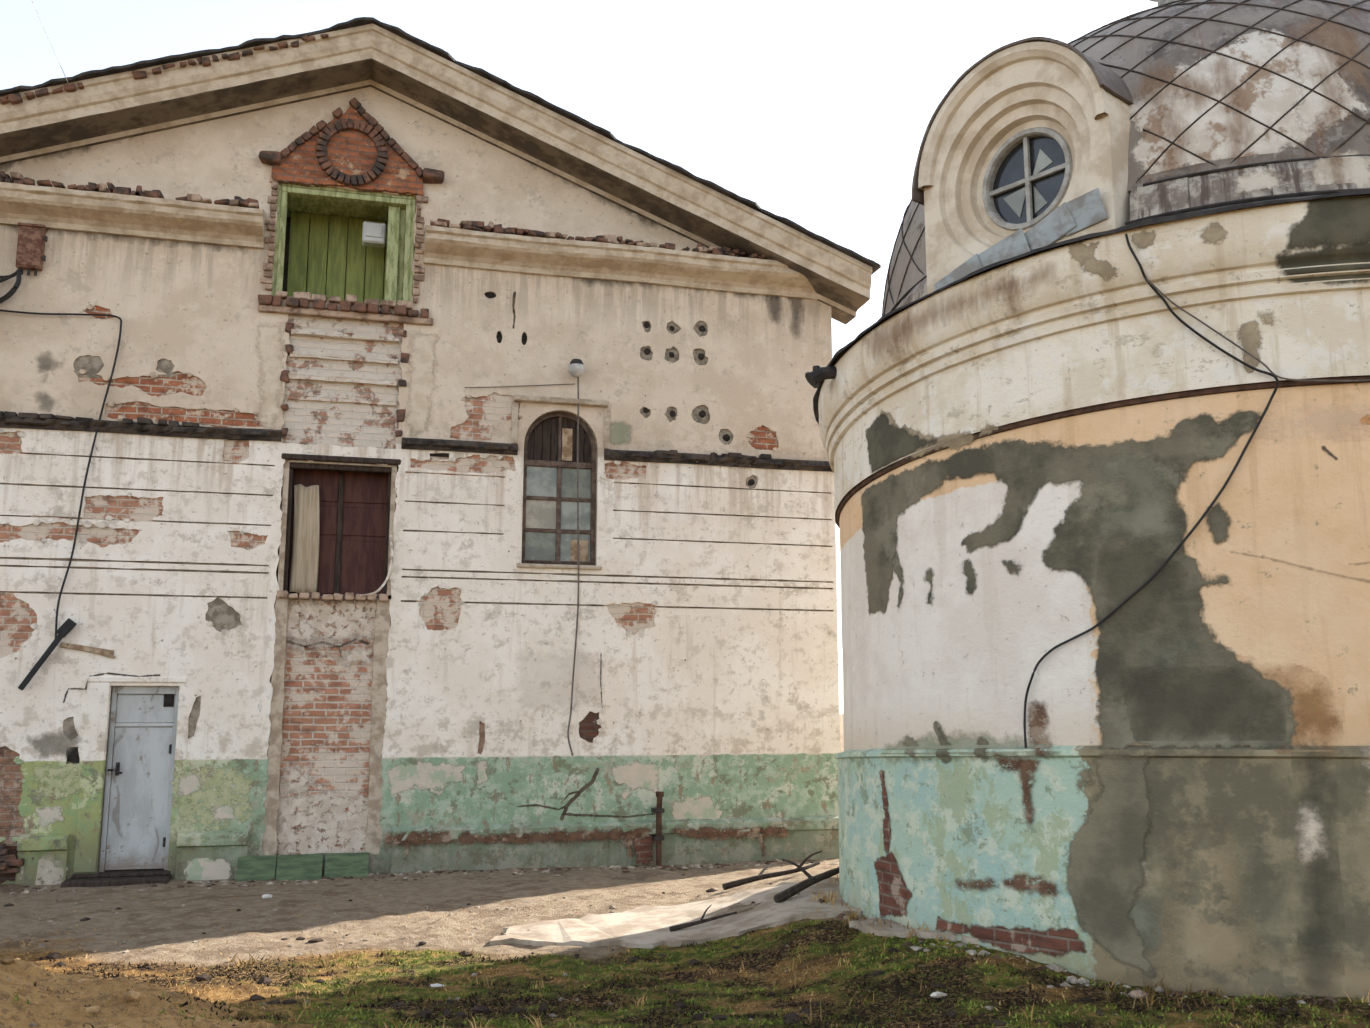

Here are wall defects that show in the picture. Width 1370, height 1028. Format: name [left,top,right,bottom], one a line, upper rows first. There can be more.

spalling [280,322,294,383]
spalling [398,311,410,387]
flaking render [0,355,264,465]
peeling [880,411,998,466]
flaking render [0,493,164,548]
flaking render [0,591,38,658]
flaking render [416,586,465,631]
flaking render [603,600,658,637]
flaking render [579,711,603,743]
flaking render [0,717,81,885]
flaking render [874,770,912,918]
flaking render [936,916,1086,957]